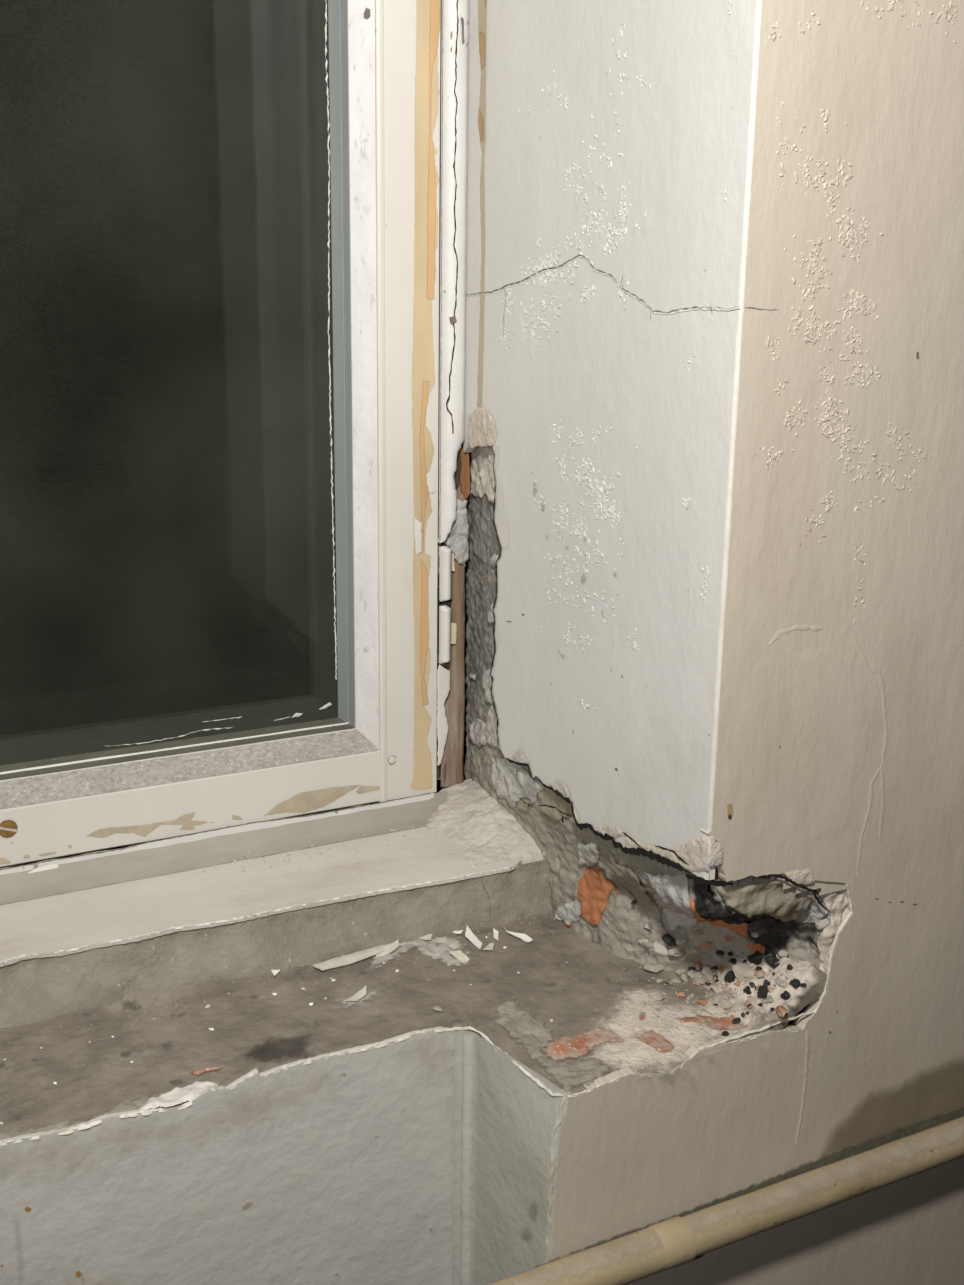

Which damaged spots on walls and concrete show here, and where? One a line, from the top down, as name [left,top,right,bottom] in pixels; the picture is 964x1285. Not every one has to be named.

crack [446,0,774,434]
spalling [0,0,853,1146]
crack [490,446,830,948]